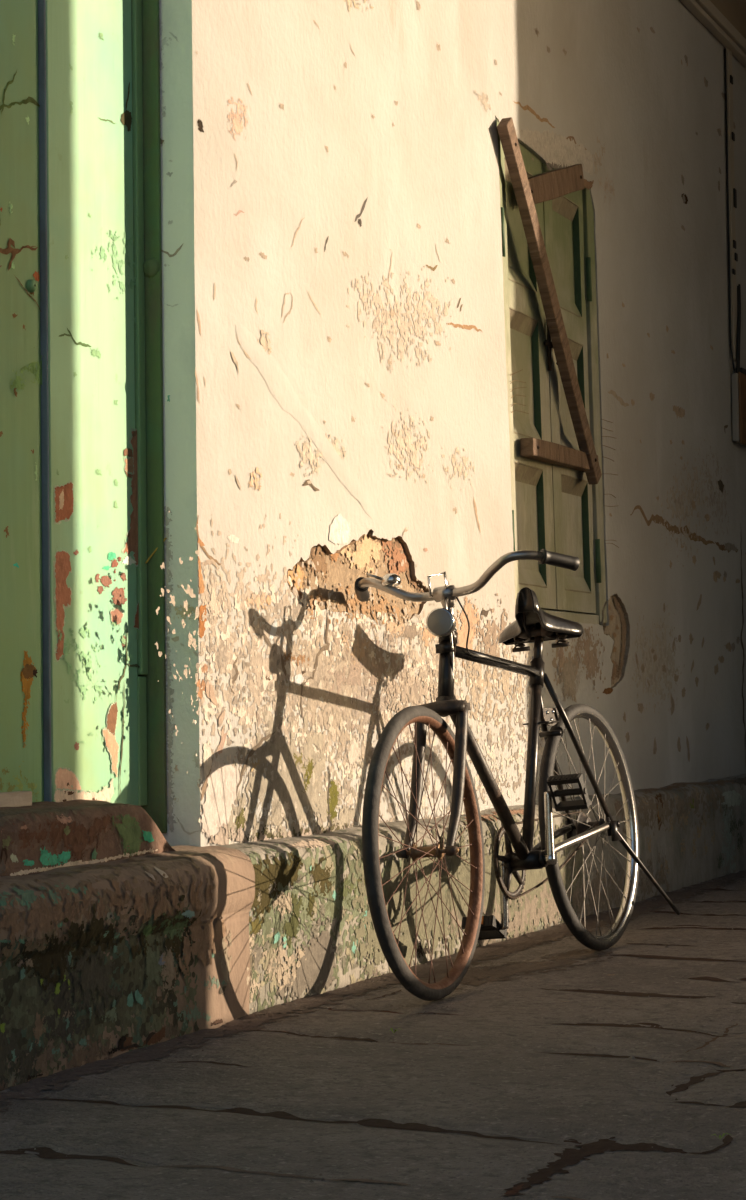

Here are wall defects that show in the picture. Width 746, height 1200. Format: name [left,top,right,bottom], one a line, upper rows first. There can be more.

flaking render [196,664,233,700]
flaking render [283,648,401,748]
flaking render [287,529,429,641]
flaking render [599,594,630,695]
crack [630,505,746,765]
flaking render [192,743,212,778]
leakage [0,809,217,958]
leakage [276,918,341,1002]